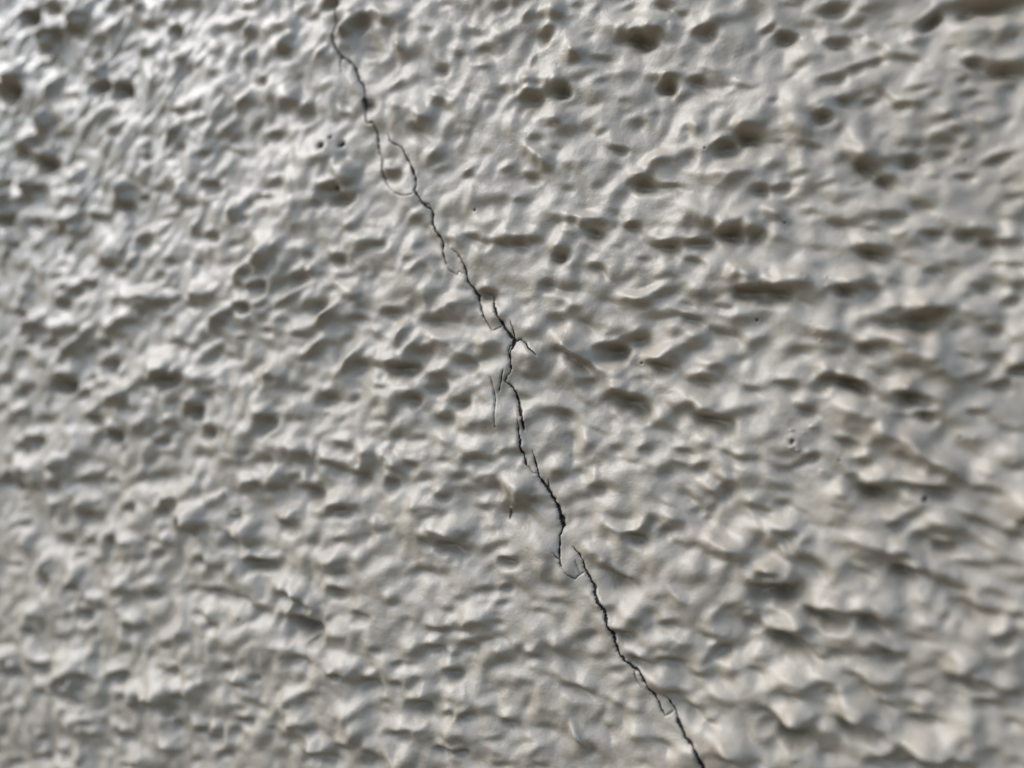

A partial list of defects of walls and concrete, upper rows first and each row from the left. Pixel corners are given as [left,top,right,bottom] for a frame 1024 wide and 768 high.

crack [332,0,705,768]